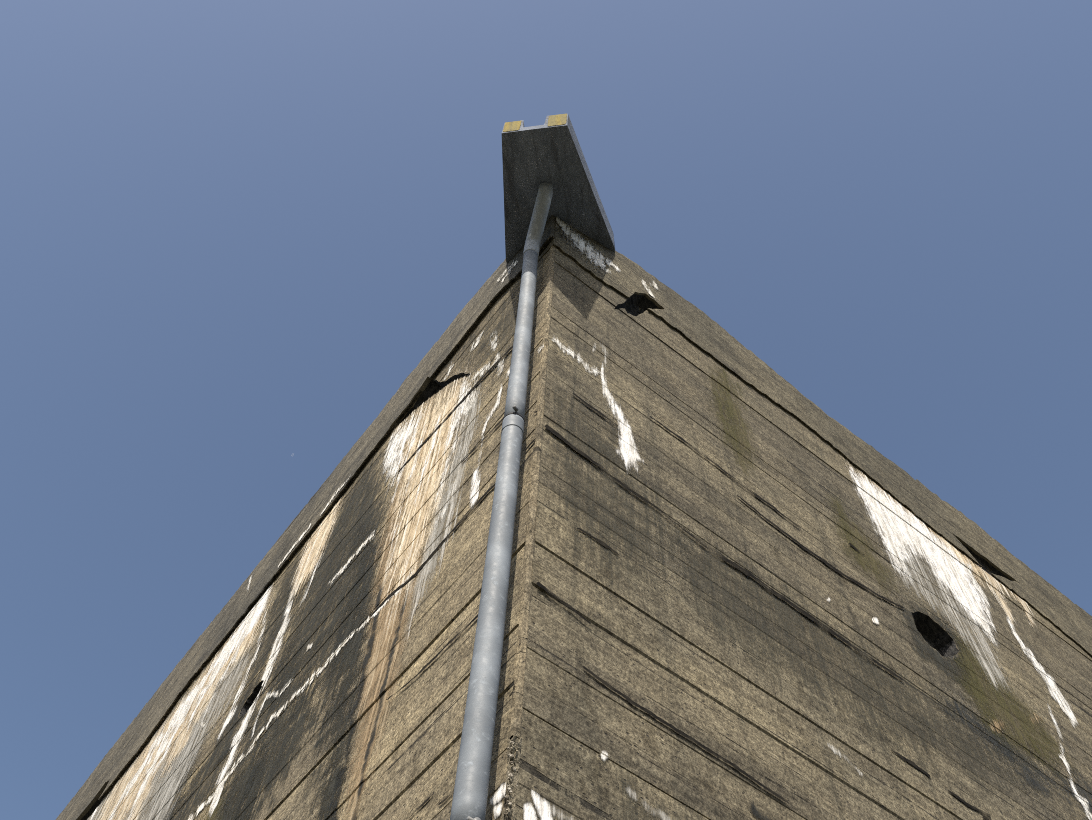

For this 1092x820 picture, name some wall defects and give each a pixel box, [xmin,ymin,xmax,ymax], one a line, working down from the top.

spalling [392,373,470,431]
leakage [470,466,480,505]
leakage [468,260,519,442]
leakage [539,338,662,550]
spalling [615,294,660,316]
leakage [88,458,412,820]
leakage [685,467,1092,820]
leakage [524,790,572,820]